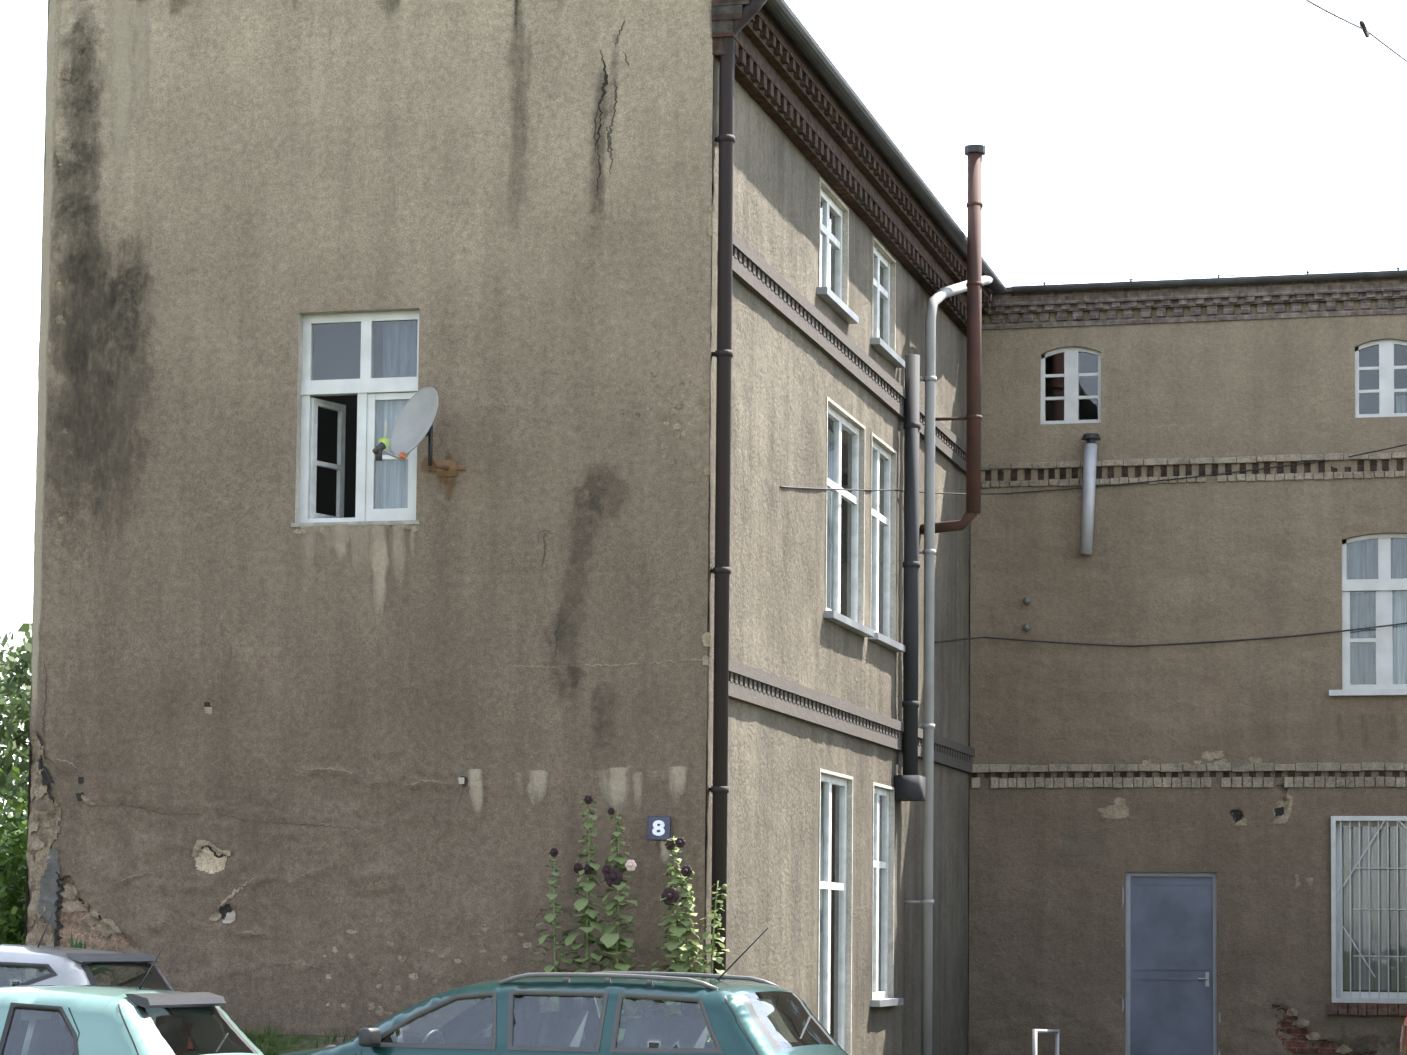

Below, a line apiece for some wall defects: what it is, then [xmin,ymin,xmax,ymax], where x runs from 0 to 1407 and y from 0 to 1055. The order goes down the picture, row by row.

water stain [111,0,146,138]
crack [593,21,629,199]
flaking render [1230,810,1247,825]
flaking render [1272,785,1293,824]
flaking render [24,733,145,985]
flaking render [192,840,234,874]
flaking render [209,878,254,923]
flaking render [1272,1004,1378,1055]